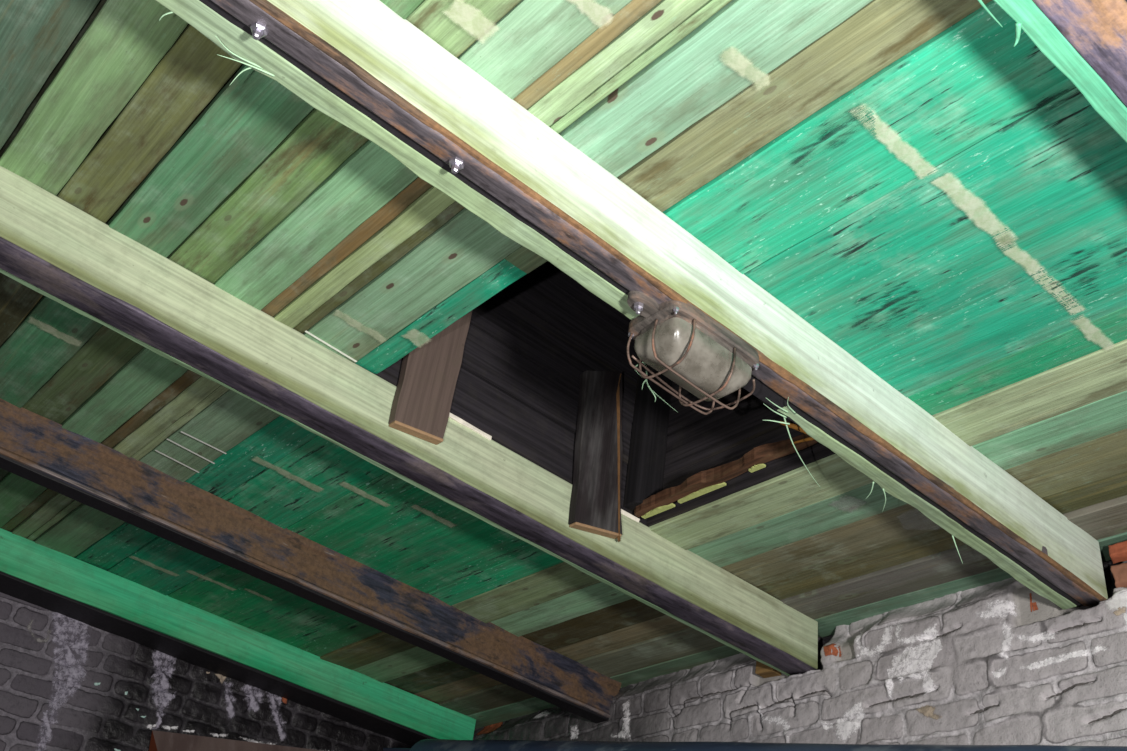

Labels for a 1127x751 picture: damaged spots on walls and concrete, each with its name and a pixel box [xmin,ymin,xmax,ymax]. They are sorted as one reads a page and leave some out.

corrosion [249,0,1107,602]
flaking render [1108,541,1127,588]
water stain [36,612,89,751]
water stain [147,650,195,733]
water stain [856,624,943,698]